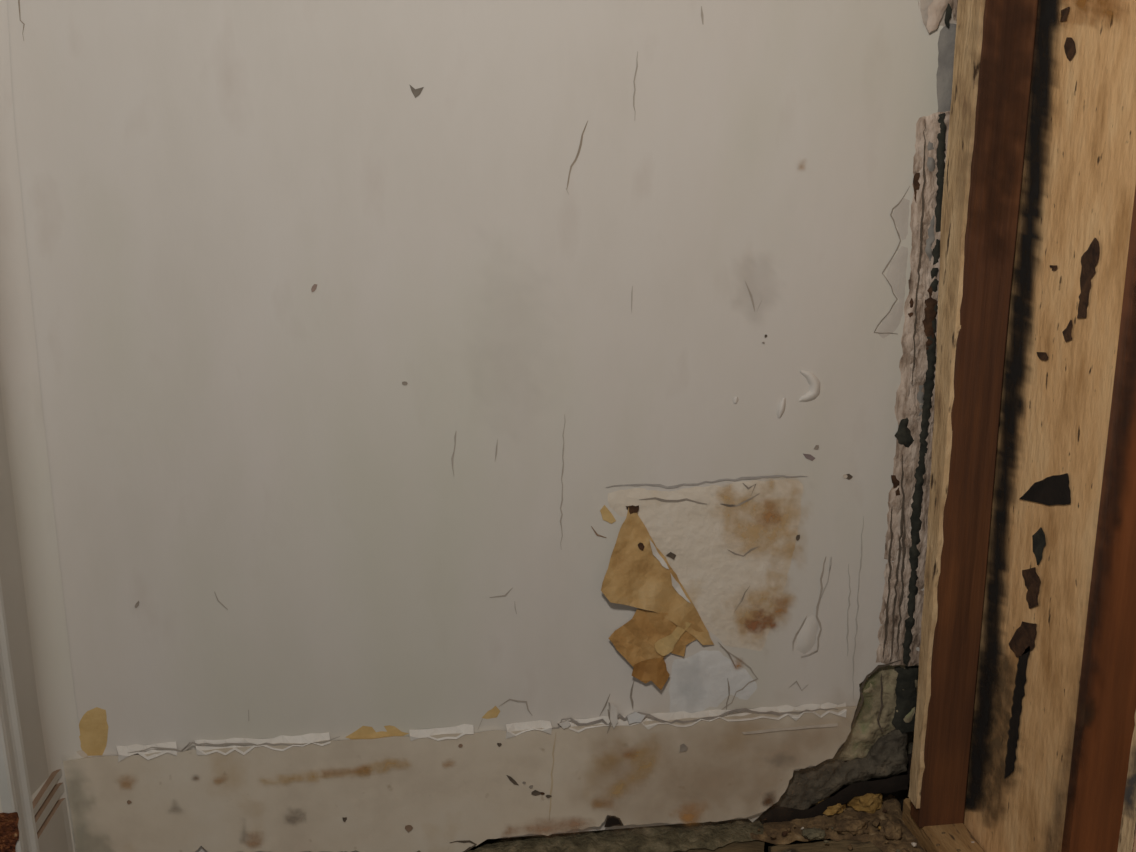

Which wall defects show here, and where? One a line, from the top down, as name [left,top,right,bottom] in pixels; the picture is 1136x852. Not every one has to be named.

peeling [918,0,958,33]
crack [566,121,588,194]
peeling [568,111,950,824]
peeling [77,707,177,762]
peeling [194,732,330,756]
peeling [346,699,552,747]